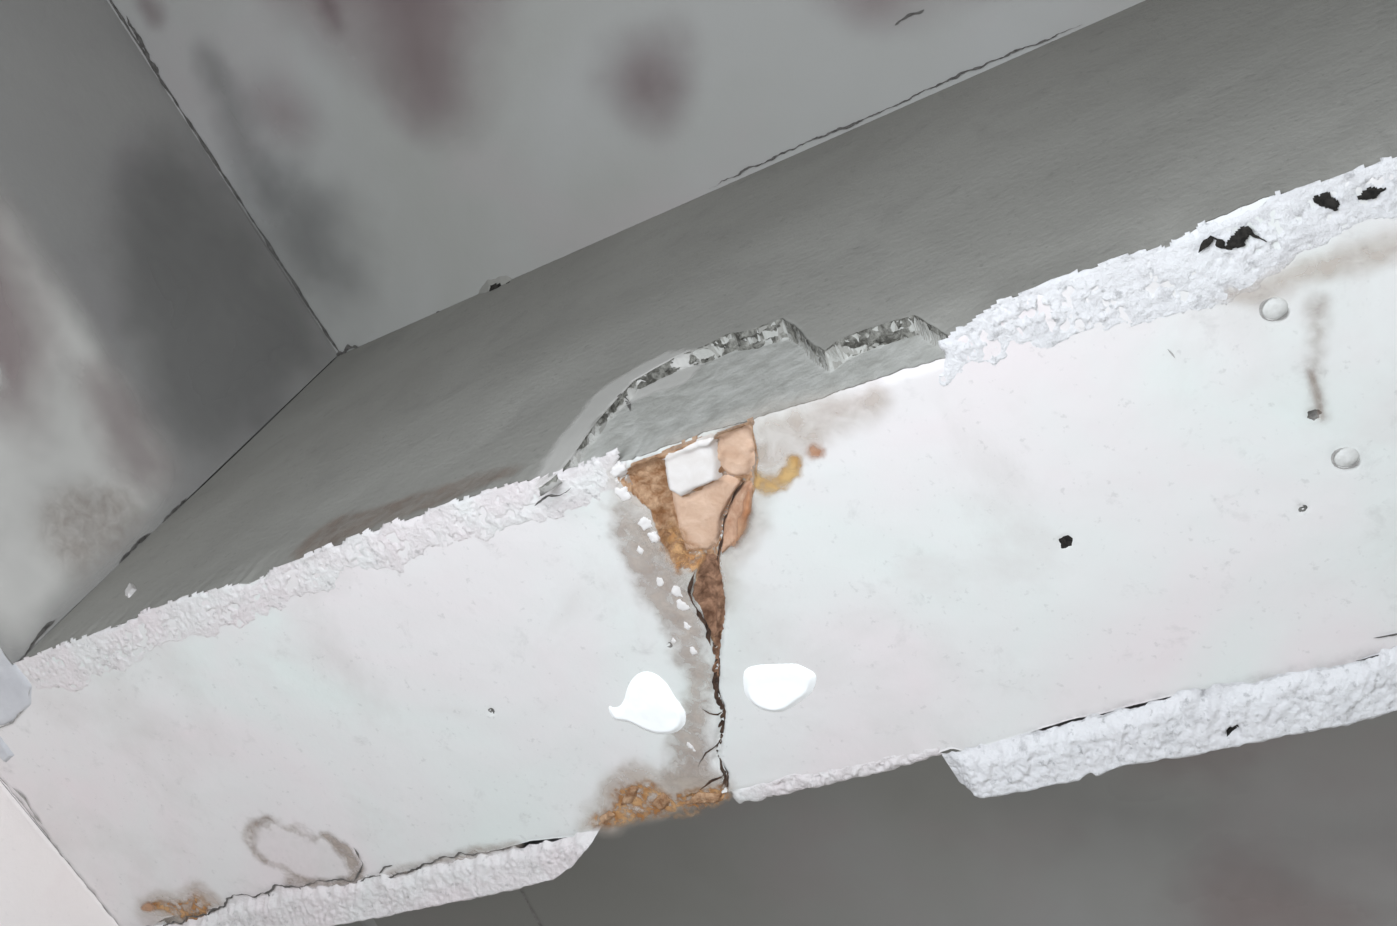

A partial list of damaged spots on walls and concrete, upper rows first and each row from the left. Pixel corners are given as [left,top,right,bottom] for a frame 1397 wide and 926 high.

corrosion [754,446,822,493]
flaking render [535,315,947,787]
crack [1357,633,1397,661]
crack [687,616,729,797]
corrosion [594,771,728,826]
water stain [322,834,362,884]
corrosion [141,888,217,924]